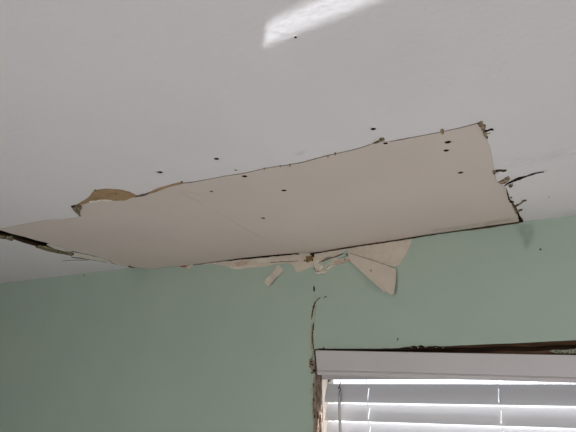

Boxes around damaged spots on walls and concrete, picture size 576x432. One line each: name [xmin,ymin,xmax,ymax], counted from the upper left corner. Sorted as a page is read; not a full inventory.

spalling [492,169,512,188]
crack [504,170,548,223]
crack [0,234,14,242]
crack [35,244,136,268]
peeling [206,239,412,286]
crack [310,286,327,359]